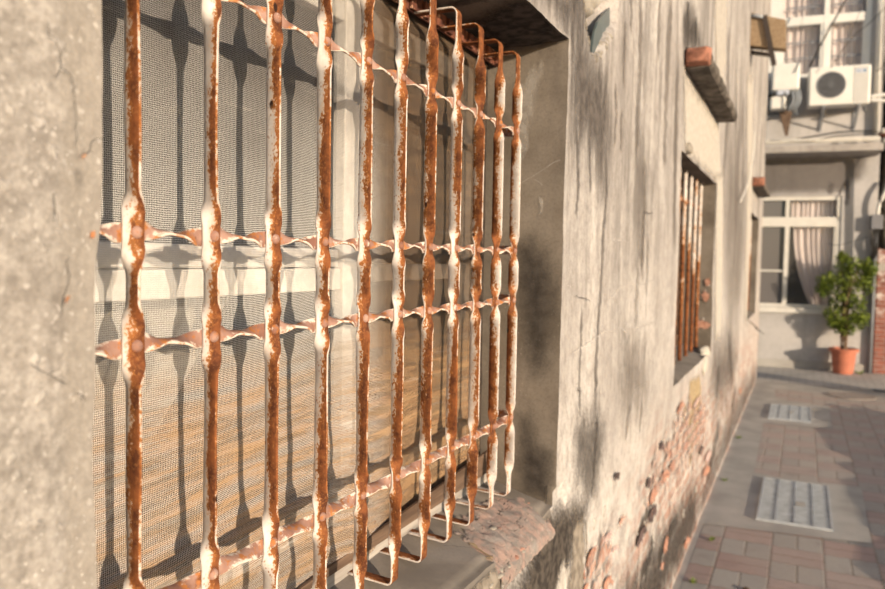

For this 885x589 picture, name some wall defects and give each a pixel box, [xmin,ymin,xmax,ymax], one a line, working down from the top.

spalling [583,0,613,62]
leakage [624,0,642,83]
leakage [658,5,679,108]
spalling [636,395,715,547]
spalling [447,496,555,589]
spalling [583,505,626,589]